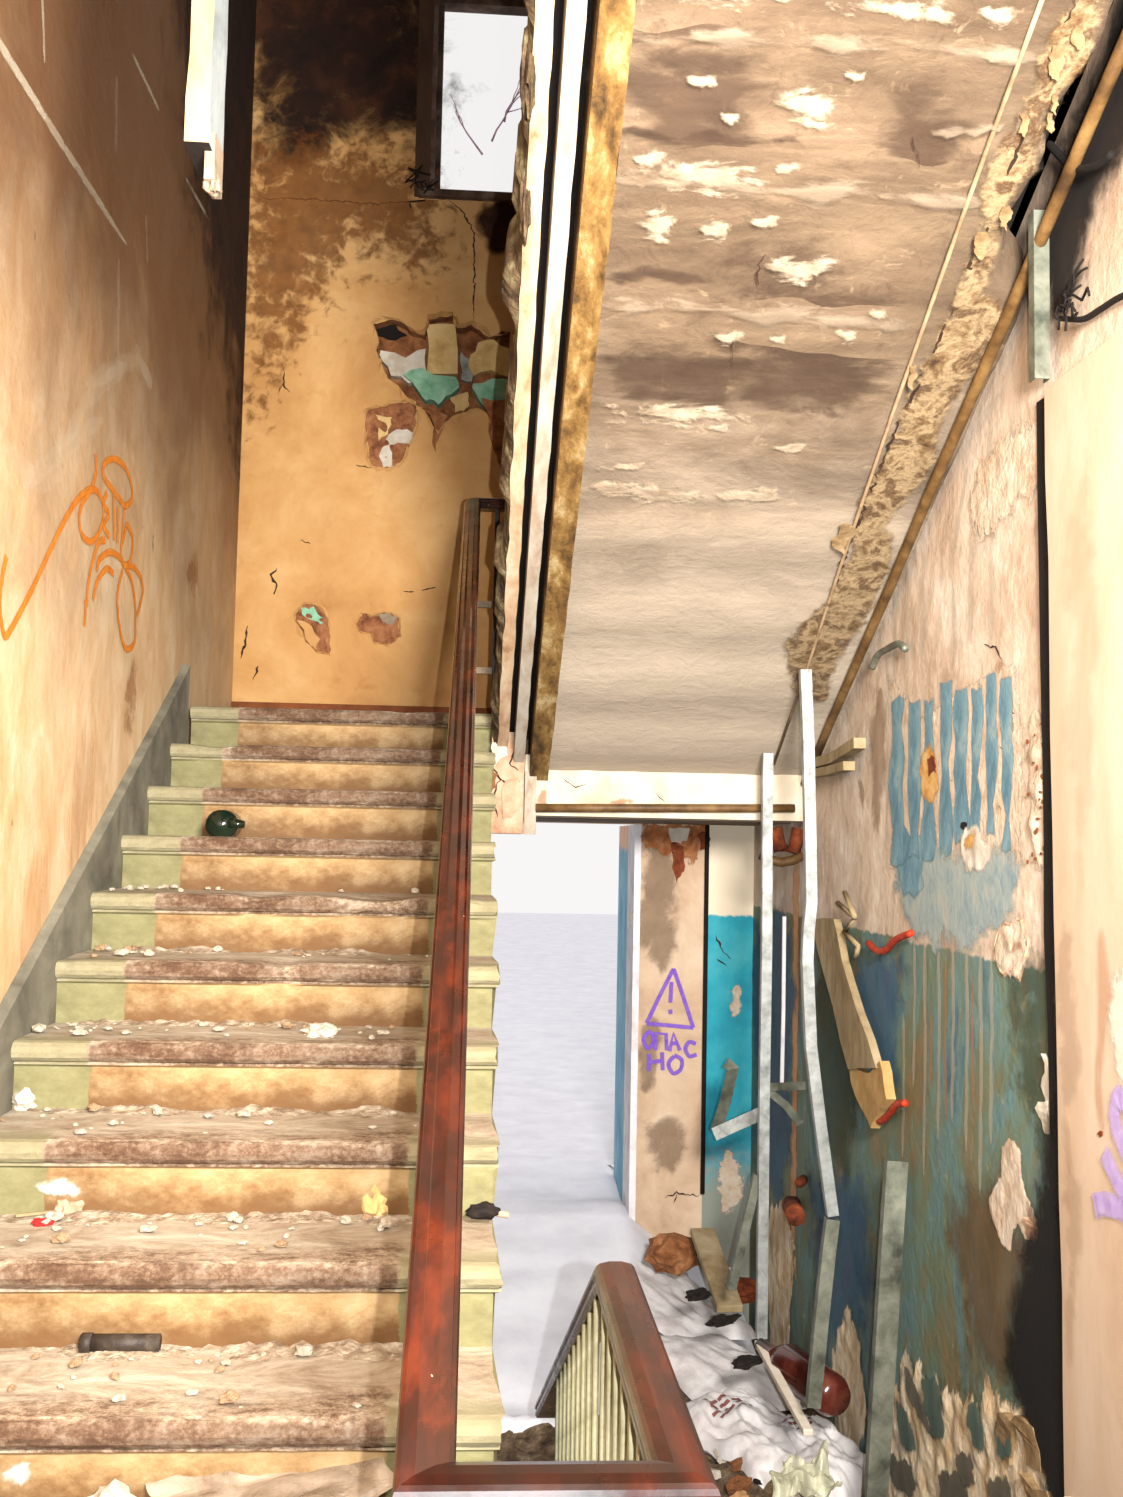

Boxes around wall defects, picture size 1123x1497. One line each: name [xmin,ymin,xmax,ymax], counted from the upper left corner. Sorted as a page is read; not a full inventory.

leakage [626,25,759,147]
leakage [891,91,966,167]
leakage [246,133,453,382]
flaking render [363,0,536,819]
leakage [607,339,876,411]
flaking render [767,0,1100,702]
leakage [631,848,676,970]
flaking render [641,824,711,882]
peeling [887,664,1044,982]
leakage [649,1118,684,1170]
peeling [989,1138,1035,1251]
flaking render [888,1349,1051,1497]